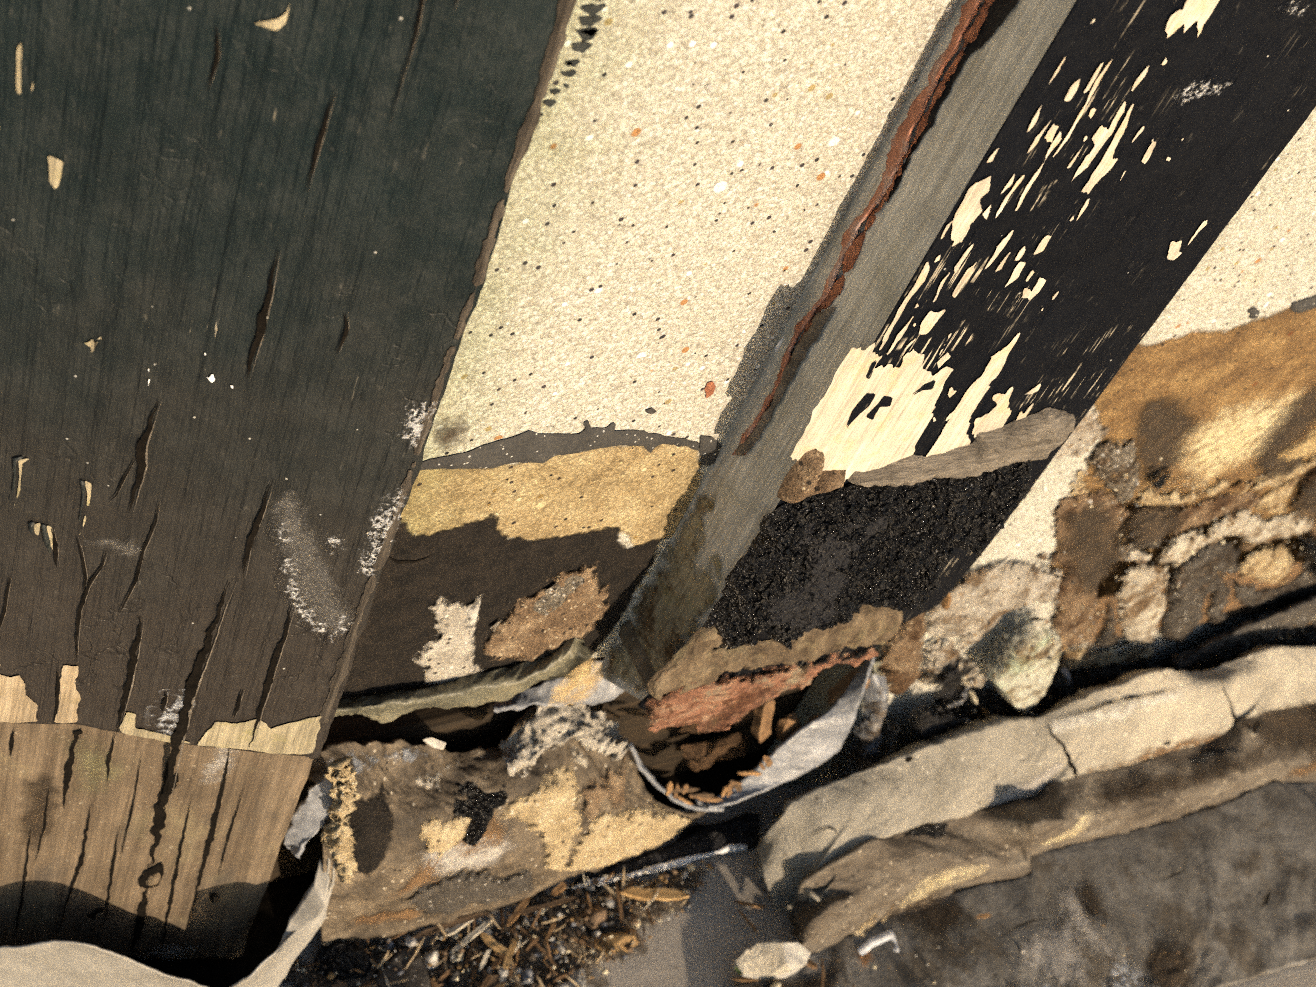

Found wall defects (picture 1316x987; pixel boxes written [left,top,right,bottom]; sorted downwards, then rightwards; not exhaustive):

peeling [1165,0,1219,38]
crack [246,251,281,379]
peeling [790,59,1171,480]
water stain [1047,308,1316,599]
spalling [1037,455,1316,652]
crack [12,400,296,957]
crack [8,730,16,757]
peeling [120,712,321,754]
water stain [990,764,1062,806]
crack [1048,686,1184,777]
water stain [896,872,974,936]
water stain [1020,884,1124,986]